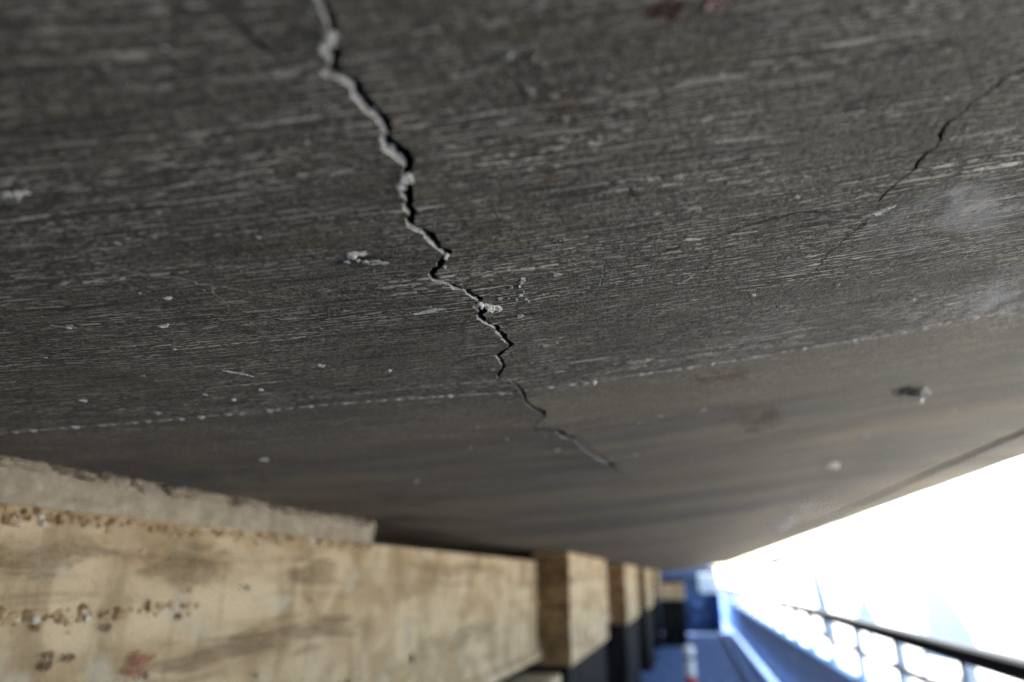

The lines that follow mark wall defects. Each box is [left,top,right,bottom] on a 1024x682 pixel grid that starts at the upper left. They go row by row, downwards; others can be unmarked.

crack [202,0,609,464]
crack [714,69,1024,273]